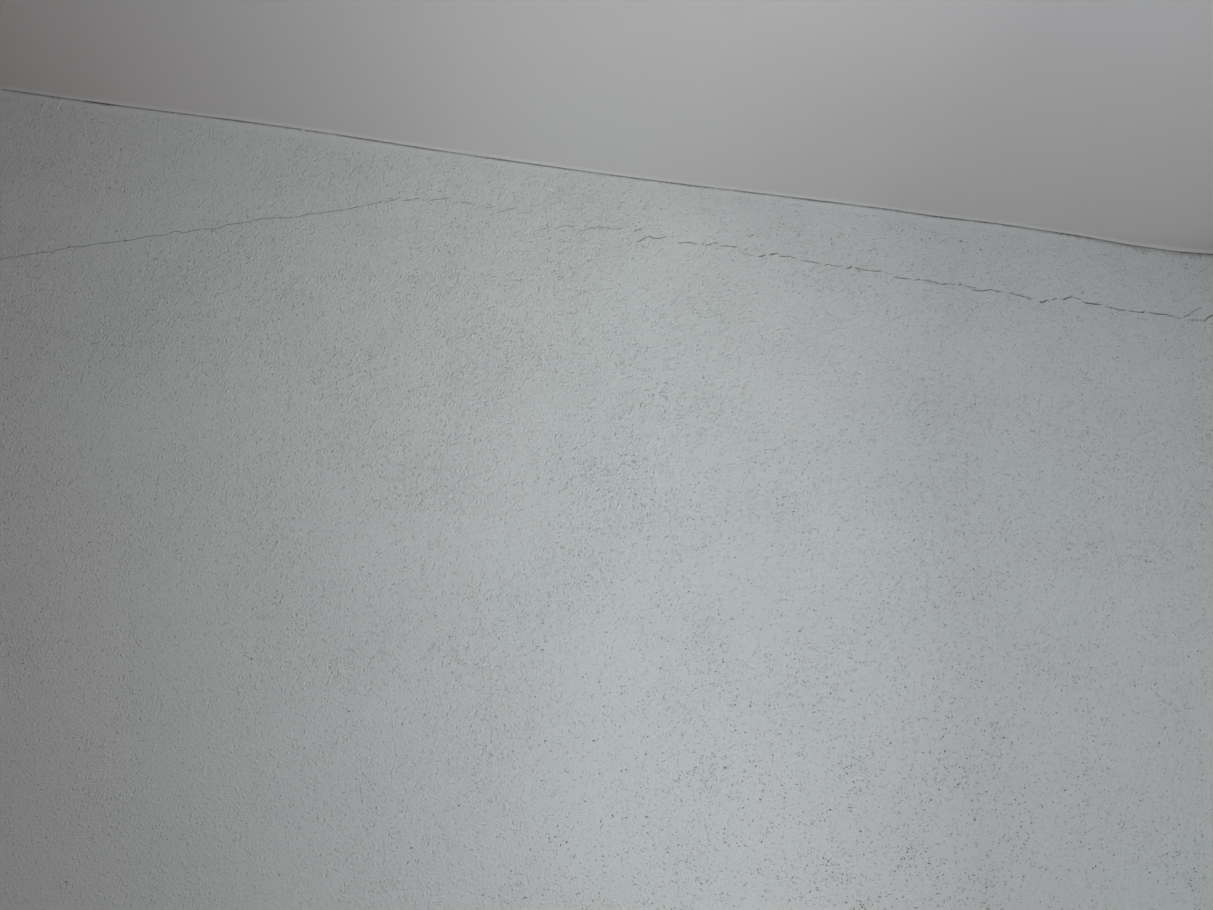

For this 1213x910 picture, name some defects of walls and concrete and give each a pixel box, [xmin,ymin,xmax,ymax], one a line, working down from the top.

crack [23,92,120,106]
crack [1054,232,1213,255]